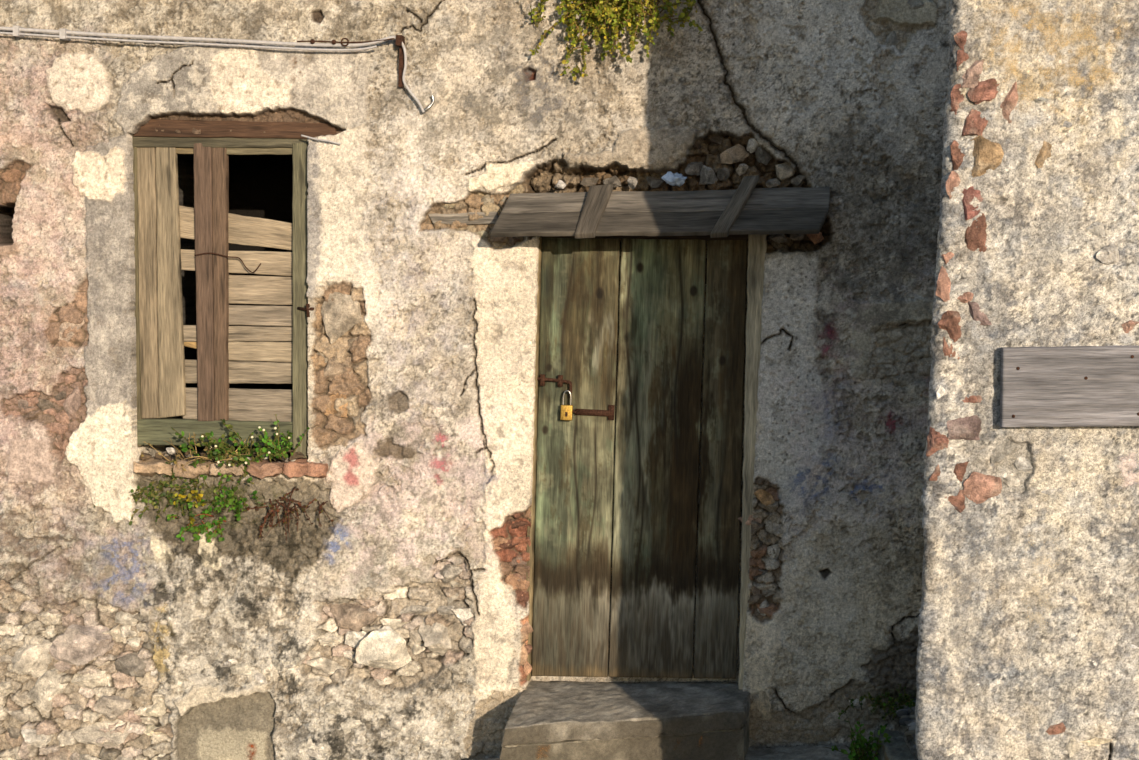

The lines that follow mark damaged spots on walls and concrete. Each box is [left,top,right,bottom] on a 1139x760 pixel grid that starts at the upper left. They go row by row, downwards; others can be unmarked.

crack [401,0,445,32]
crack [696,0,809,185]
flaking render [0,161,30,246]
spalling [421,133,807,248]
flaking render [2,367,88,460]
flaking render [312,282,371,449]
crack [461,299,495,483]
flaking render [866,252,992,388]
spalling [926,395,1032,513]
flaking render [0,578,173,760]
flaking render [303,552,475,693]
flaking render [463,509,534,759]